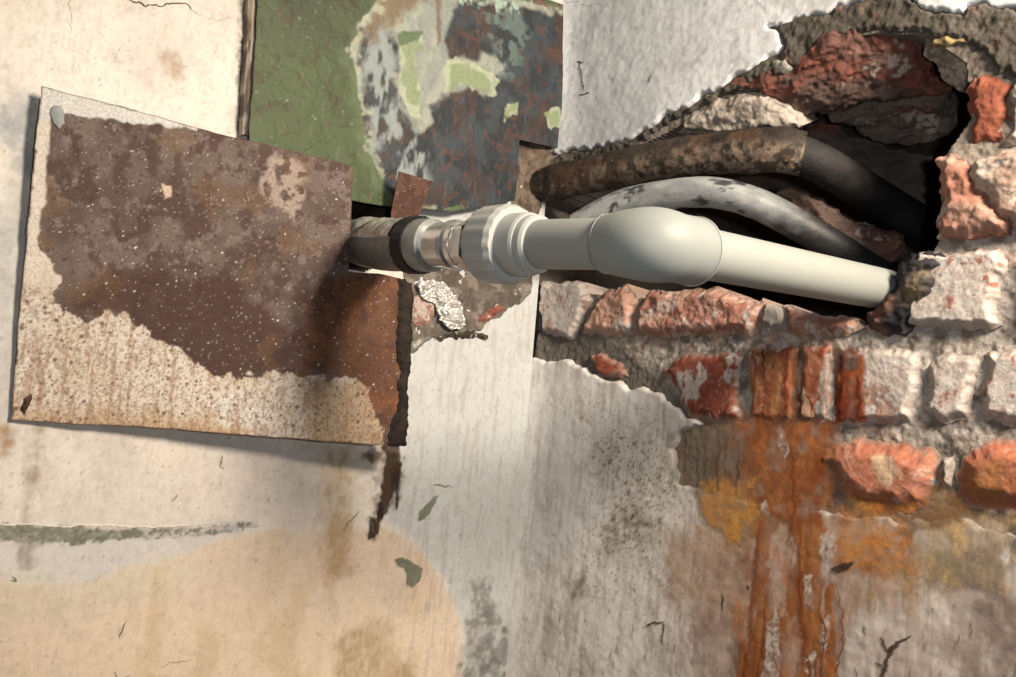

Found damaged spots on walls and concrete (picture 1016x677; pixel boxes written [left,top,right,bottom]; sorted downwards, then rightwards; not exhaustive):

crack [130,0,197,14]
spalling [351,201,392,219]
flaking render [403,0,1016,534]
corrosion [700,344,1016,677]